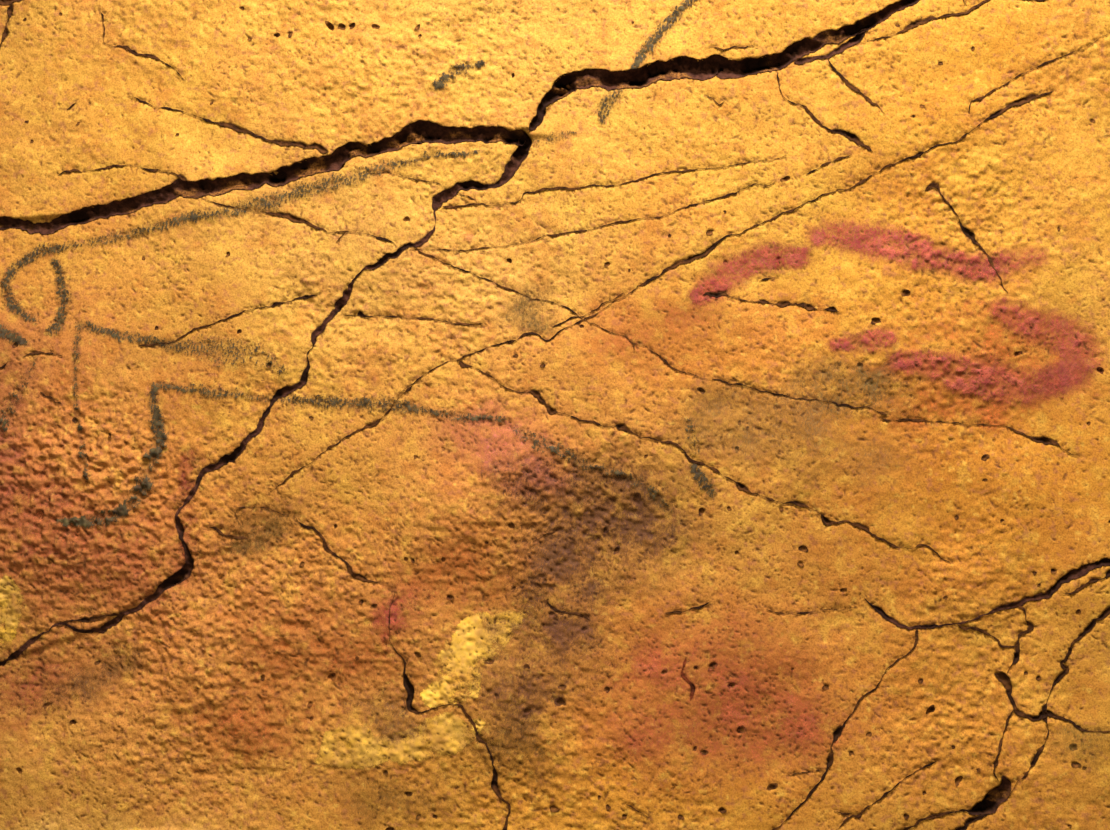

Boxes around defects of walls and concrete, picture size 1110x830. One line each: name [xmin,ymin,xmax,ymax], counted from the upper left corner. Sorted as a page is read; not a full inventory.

crack [969,32,1110,111]
crack [0,0,1075,666]
crack [209,507,511,830]
crack [681,658,695,700]
crack [768,558,1110,830]